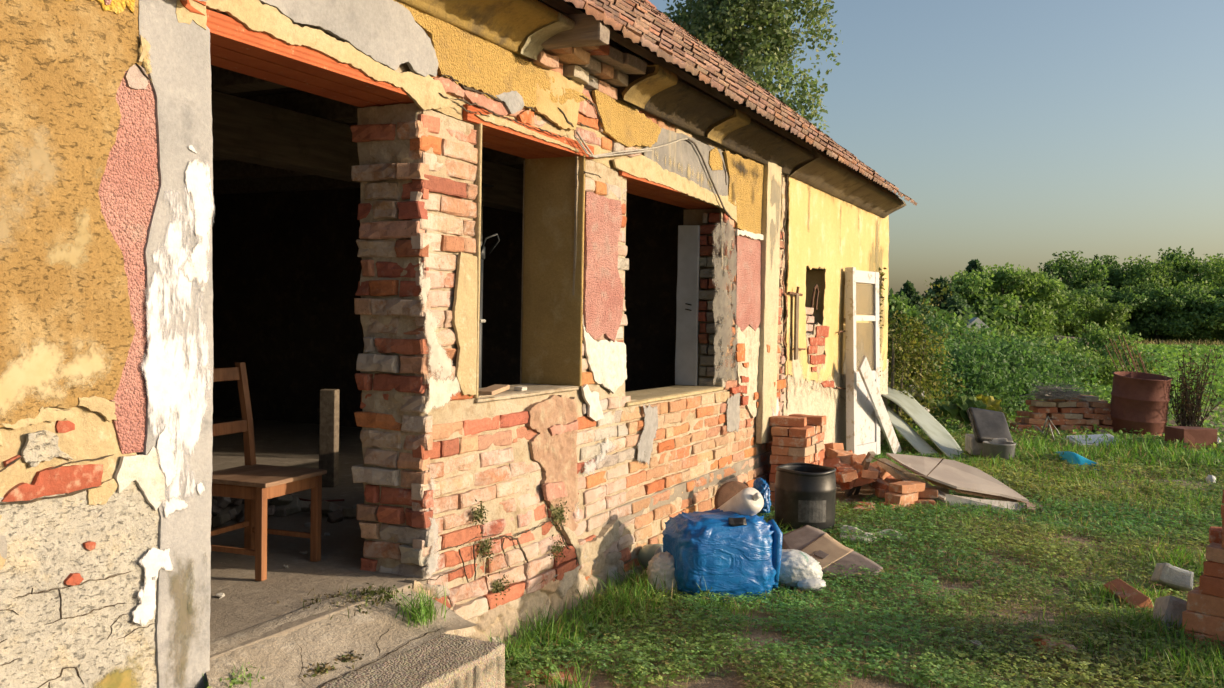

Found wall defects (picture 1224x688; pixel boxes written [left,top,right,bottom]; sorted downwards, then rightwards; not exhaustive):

flaking render [175,0,207,30]
peeling [124,63,151,90]
flaking render [433,77,534,125]
flaking render [578,89,598,119]
peeling [709,147,727,185]
peeling [142,145,215,518]
flaking render [730,343,759,408]
flaking render [806,323,834,388]
flaking render [0,396,137,519]
crack [0,571,154,666]
crack [37,667,84,688]
crack [295,625,446,688]